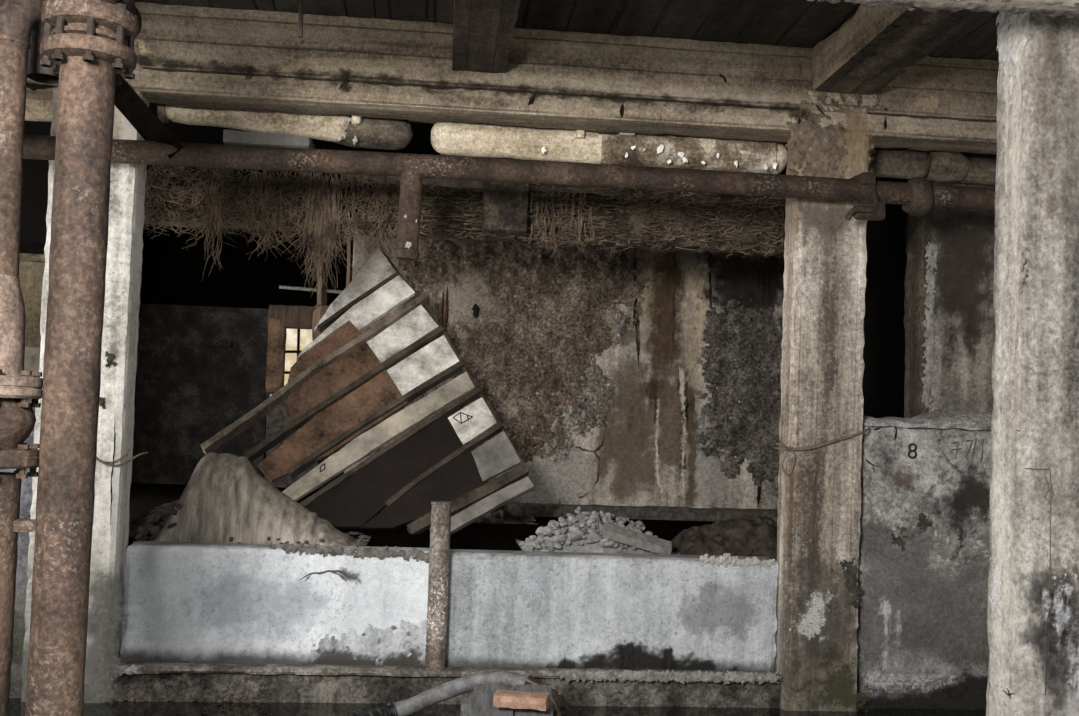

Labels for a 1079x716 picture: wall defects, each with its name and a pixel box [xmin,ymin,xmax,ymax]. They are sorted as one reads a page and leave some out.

peeling [398,238,652,464]
rust [645,252,684,406]
rust [686,386,697,504]
leakage [894,471,920,489]
leakage [925,464,990,554]
leakage [558,643,779,684]
leakage [787,590,838,673]
leakage [1022,568,1079,709]